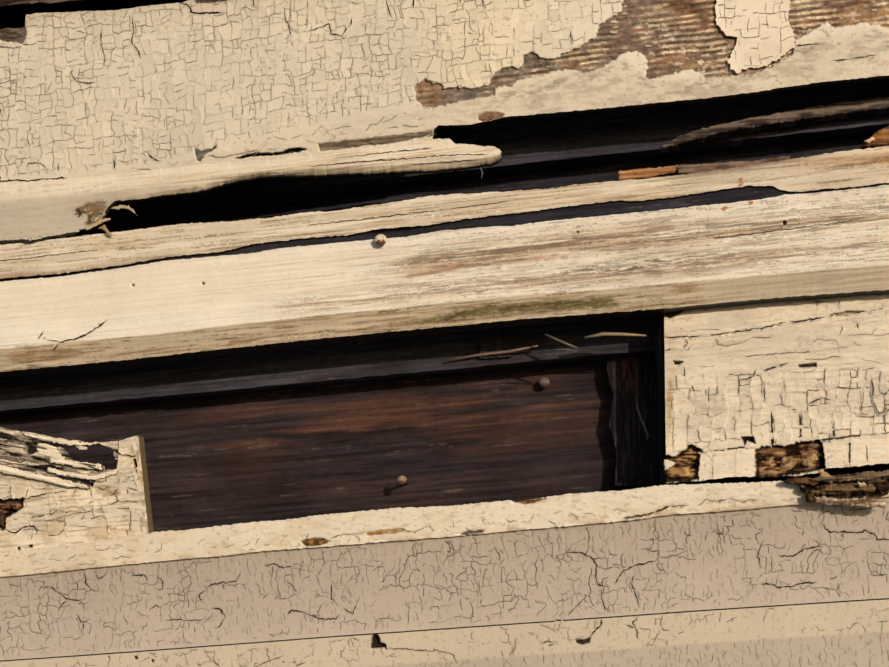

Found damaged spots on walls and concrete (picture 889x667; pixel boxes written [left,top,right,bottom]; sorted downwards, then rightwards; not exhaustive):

crack [0,0,621,182]
peeling [478,112,504,122]
peeling [415,0,889,107]
crack [38,320,106,352]
crack [664,301,889,478]